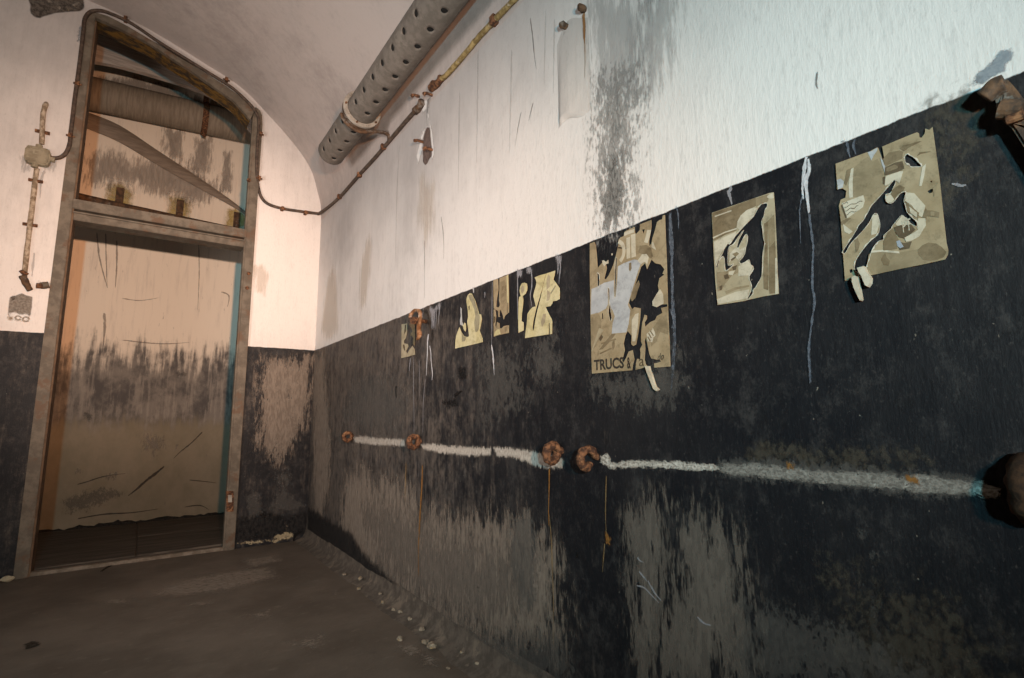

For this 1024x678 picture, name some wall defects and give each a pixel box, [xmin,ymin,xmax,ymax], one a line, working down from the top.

spalling [417,97,434,165]
water stain [589,61,645,239]
water stain [236,509,391,582]